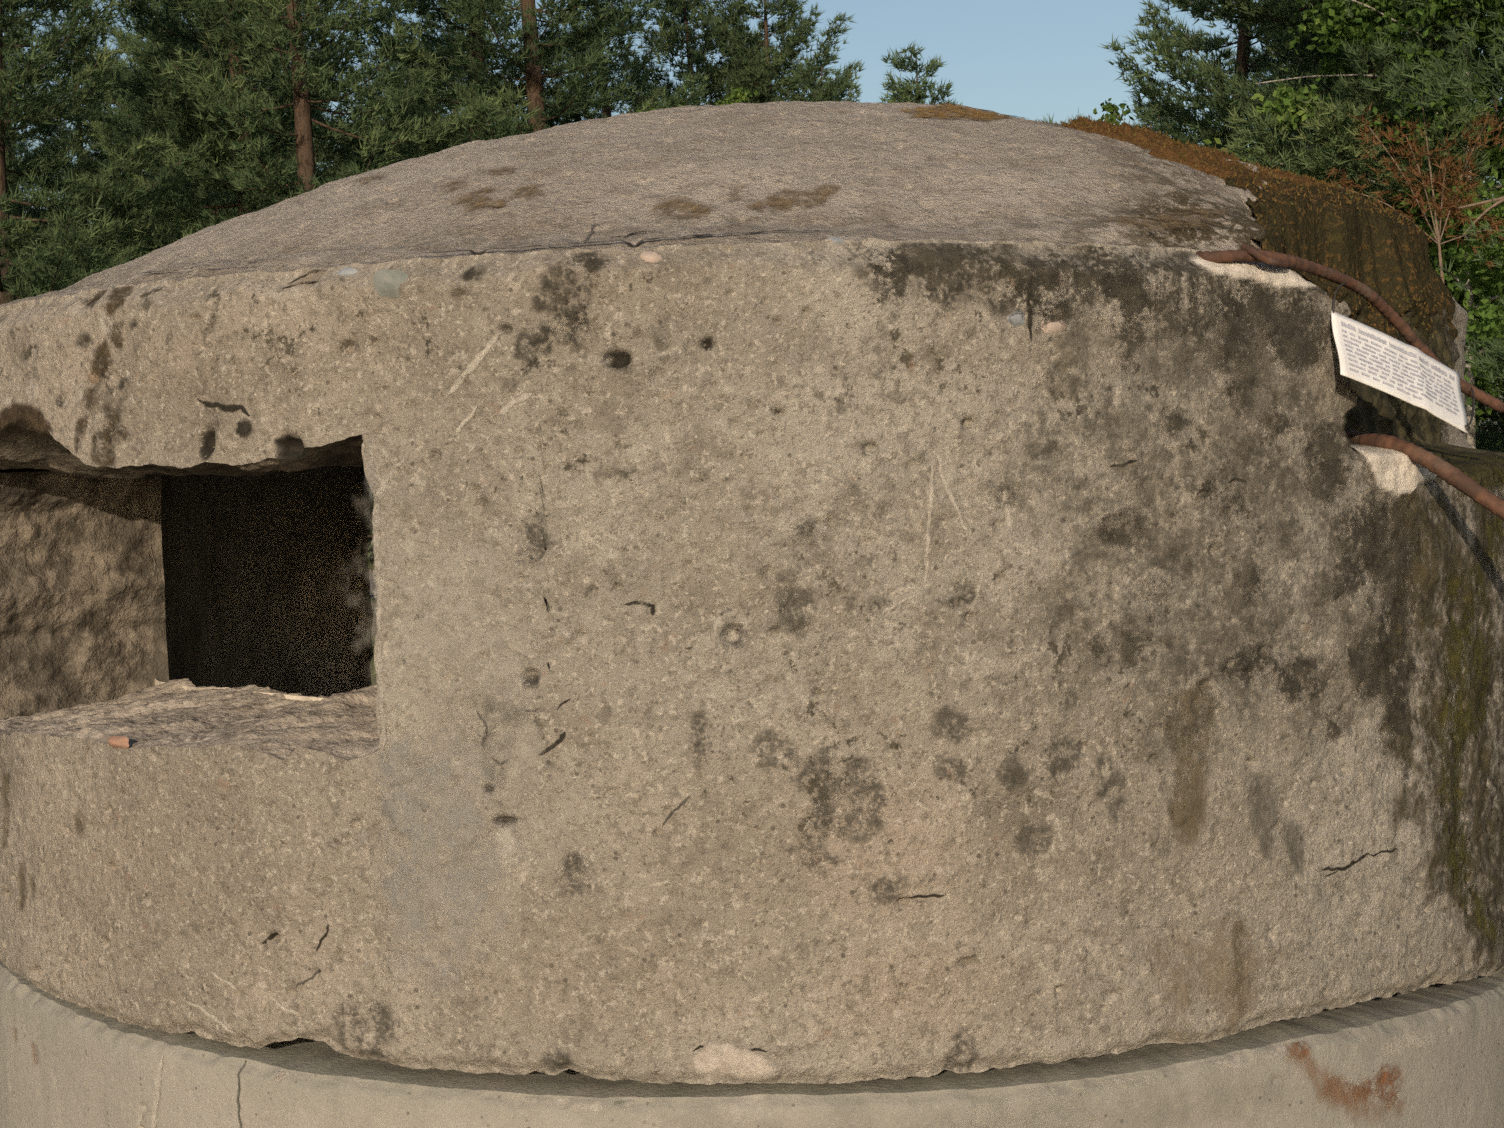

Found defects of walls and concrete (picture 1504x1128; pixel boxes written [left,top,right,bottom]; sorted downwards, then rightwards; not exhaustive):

leakage [854,242,1412,841]
leakage [776,588,812,631]
leakage [1439,511,1504,939]
leakage [757,731,882,866]
leakage [873,878,901,901]
crack [236,1060,246,1128]
corrosion [1291,1042,1402,1111]